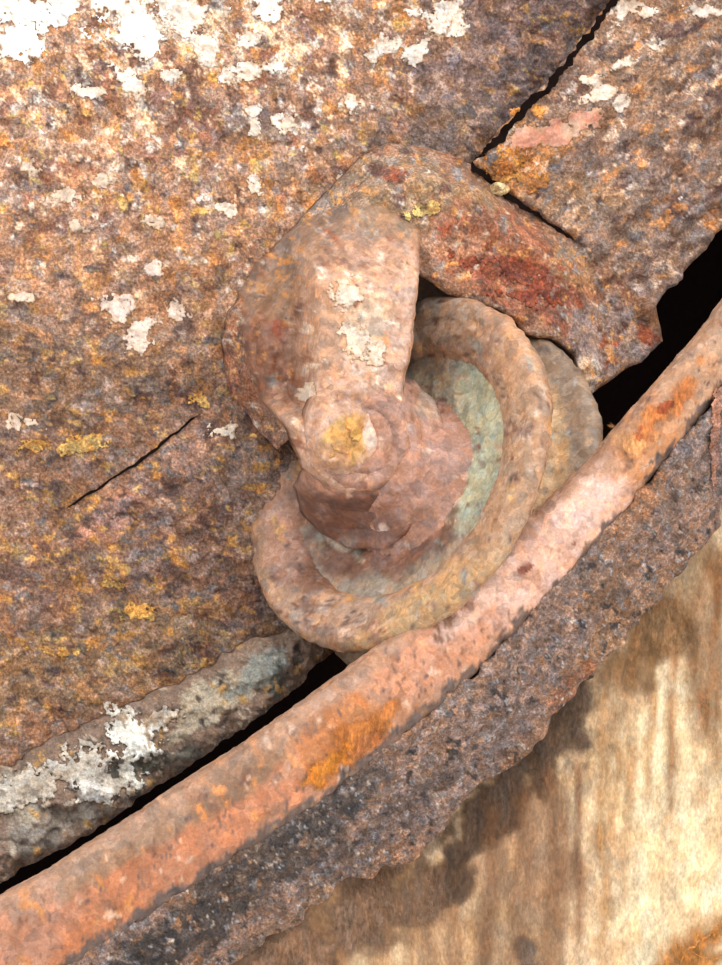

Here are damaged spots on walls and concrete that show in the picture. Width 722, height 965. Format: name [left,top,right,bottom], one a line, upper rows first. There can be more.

peeling [0,0,291,102]
peeling [244,105,301,138]
peeling [337,92,365,116]
rust [509,103,544,120]
crack [471,0,618,241]
rust [448,241,563,311]
rust [14,433,112,457]
crack [67,413,202,508]
rust [602,376,698,475]
rust [98,573,161,621]
efflorescence [0,702,186,814]
damp [240,596,693,965]